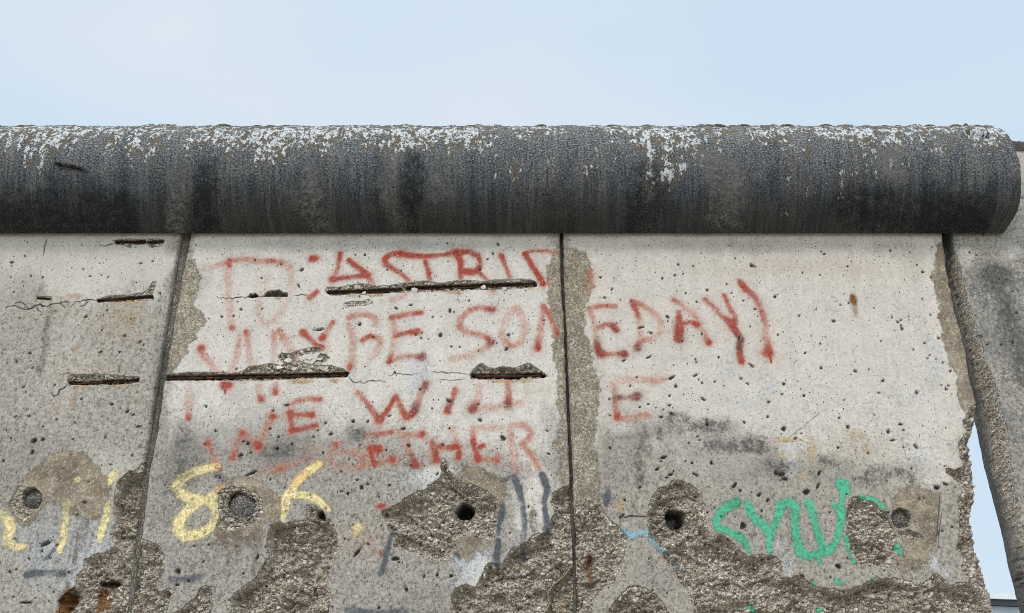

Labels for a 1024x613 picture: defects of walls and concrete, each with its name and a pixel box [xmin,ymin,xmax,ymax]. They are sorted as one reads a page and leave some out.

damp [0,186,135,233]
damp [380,151,452,233]
crack [5,299,94,312]
corrosion [97,282,156,305]
corrosion [325,279,537,297]
corrosion [67,374,140,400]
corrosion [166,364,350,383]
corrosion [470,364,548,383]
spalling [381,248,669,613]
spalling [647,241,1024,613]
spalling [6,444,216,613]
spalling [211,476,339,613]